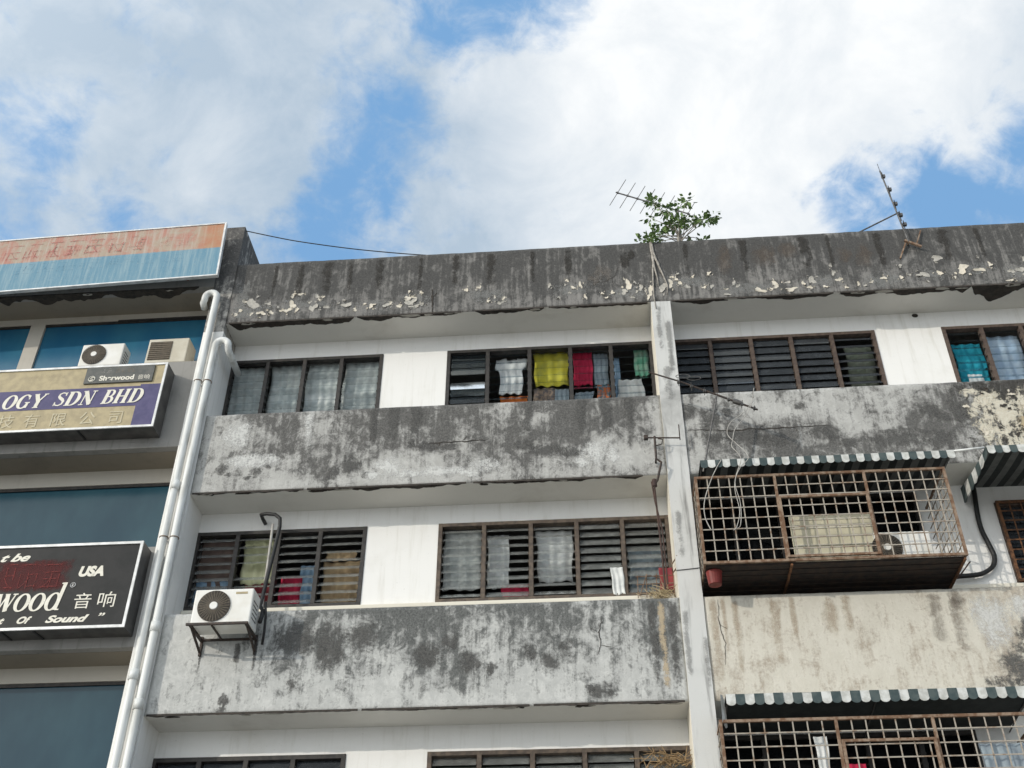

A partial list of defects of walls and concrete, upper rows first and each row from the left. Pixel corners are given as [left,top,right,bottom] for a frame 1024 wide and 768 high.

spalling [462,255,1024,315]
water stain [216,424,277,480]
water stain [327,455,499,479]
water stain [369,407,461,450]
water stain [515,399,619,467]
water stain [805,403,958,449]
peeling [947,379,1024,460]
mould [274,622,380,669]
water stain [413,636,498,676]
water stain [648,602,682,686]
water stain [986,619,1024,687]
water stain [586,681,618,698]